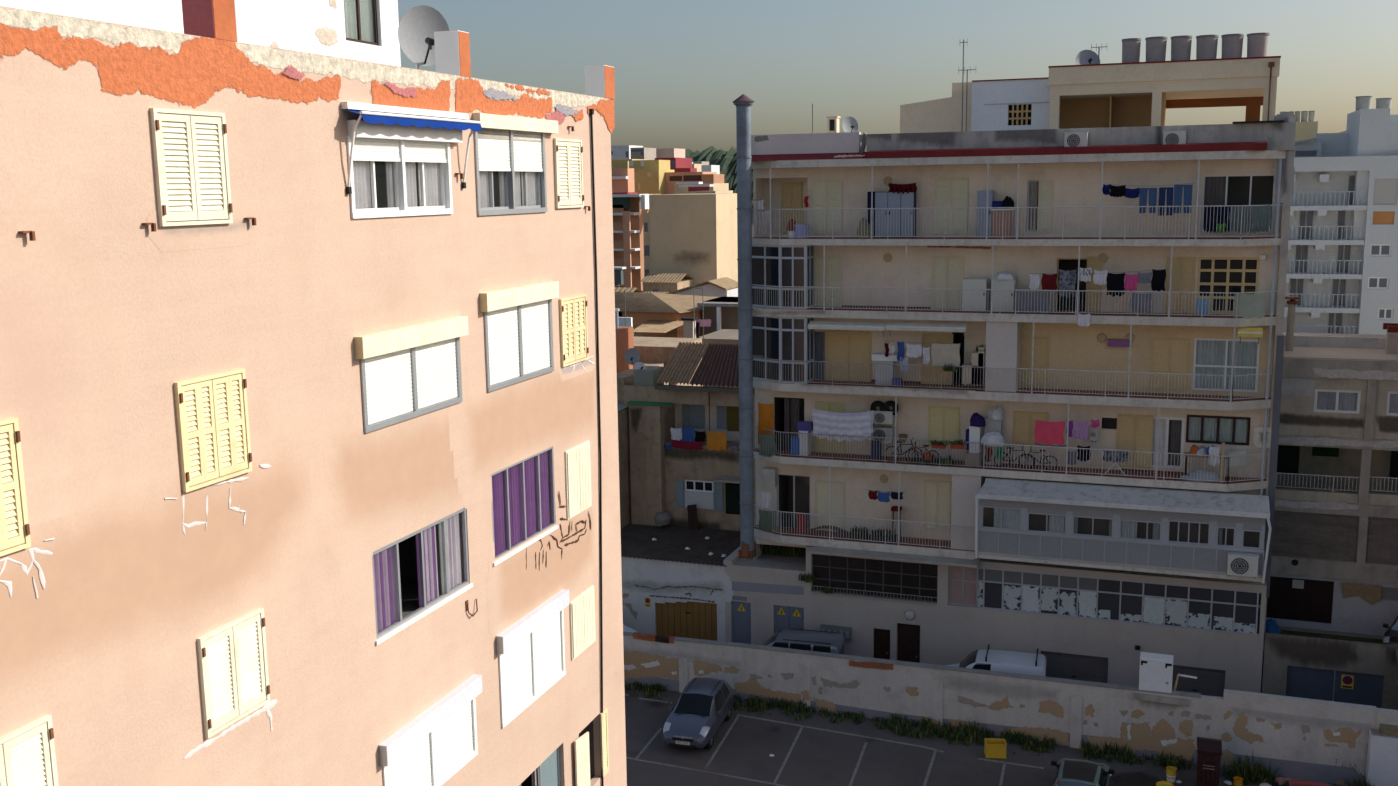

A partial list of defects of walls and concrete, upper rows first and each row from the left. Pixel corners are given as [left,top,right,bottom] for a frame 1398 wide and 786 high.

peeling [0,7,615,133]
crack [165,464,271,535]
crack [526,492,591,571]
crack [0,538,55,598]
spalling [622,594,893,713]
spalling [958,696,1070,746]
spalling [1083,704,1282,768]
spalling [1301,724,1361,748]